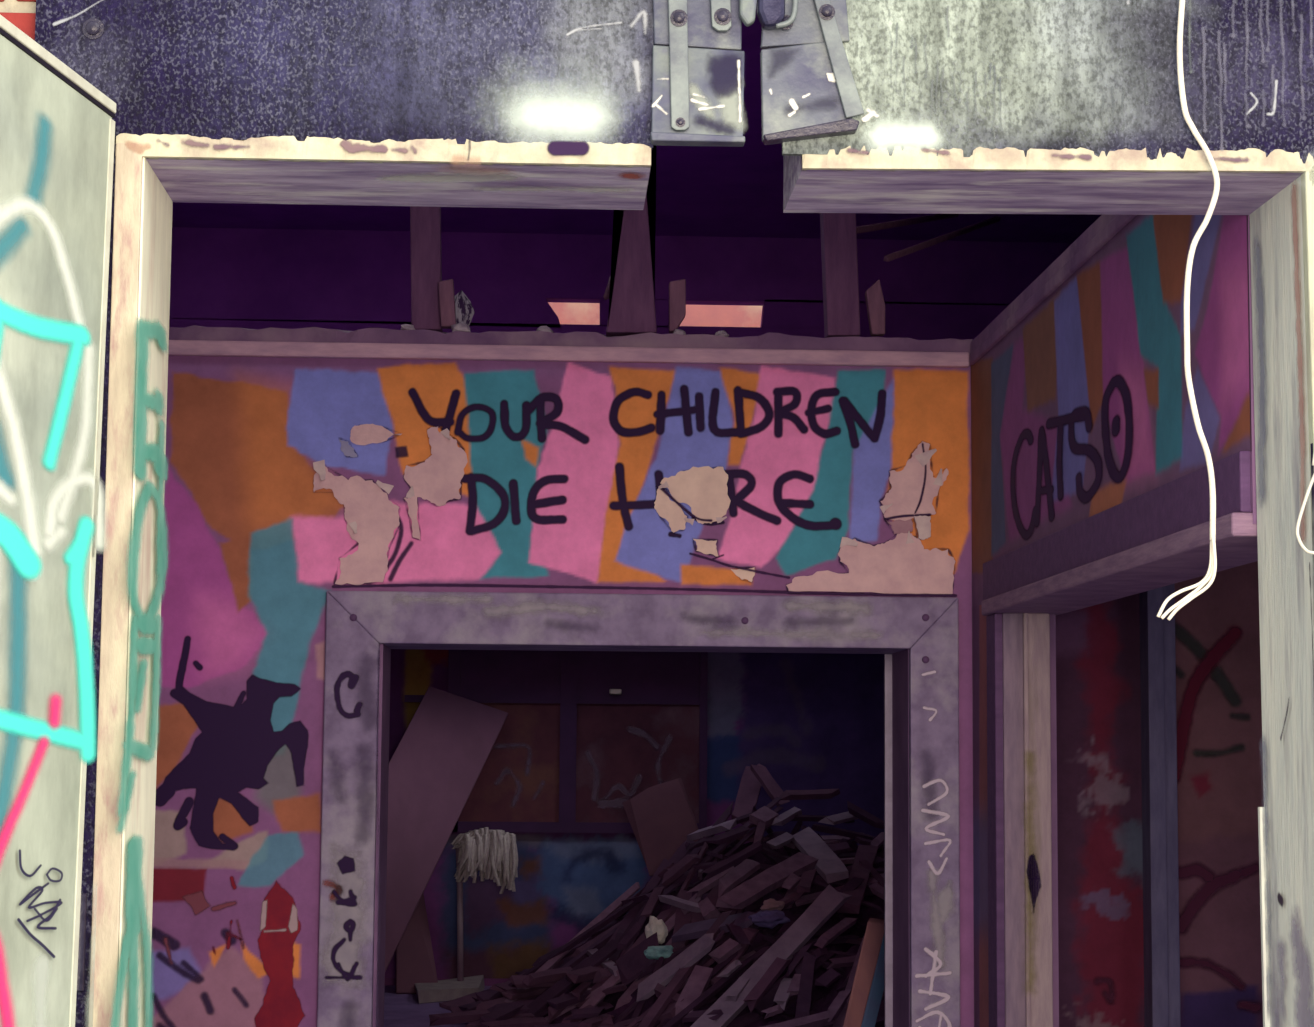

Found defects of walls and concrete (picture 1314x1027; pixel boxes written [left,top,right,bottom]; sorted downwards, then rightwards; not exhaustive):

damp [1189,0,1226,97]
damp [1245,0,1312,107]
peeling [162,140,249,150]
peeling [340,140,417,154]
peeling [313,424,468,585]
peeling [654,466,731,557]
peeling [786,441,955,594]
peeling [731,567,755,582]